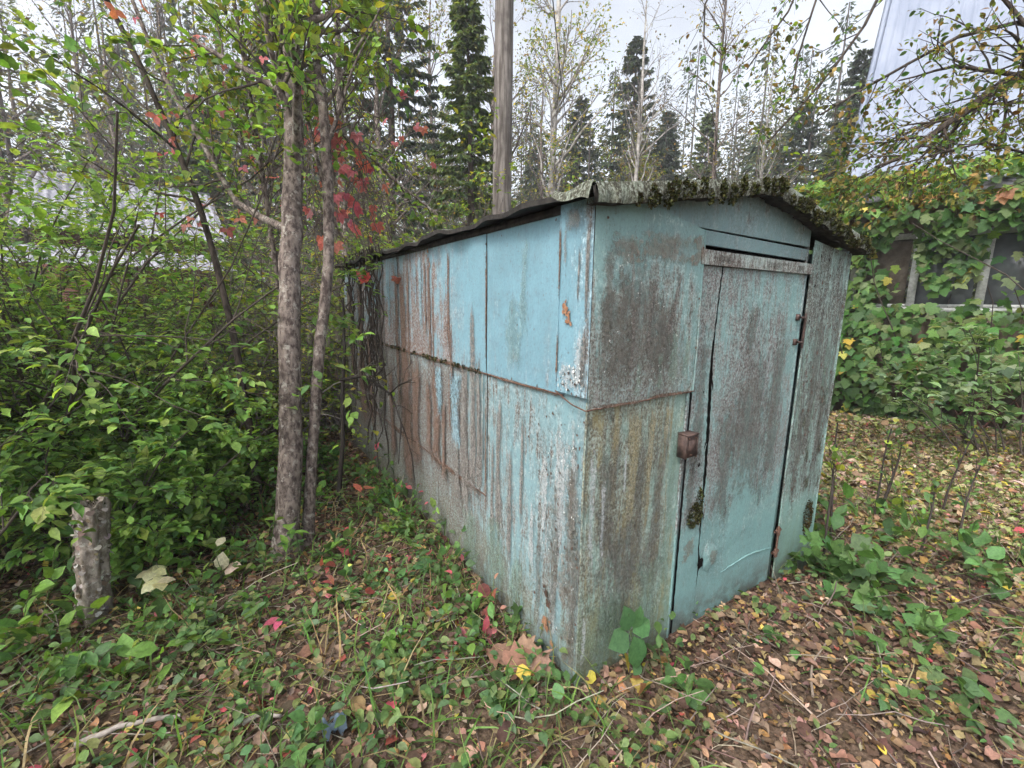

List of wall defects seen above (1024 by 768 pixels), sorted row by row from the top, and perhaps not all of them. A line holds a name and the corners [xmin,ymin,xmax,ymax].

corrosion [558,224,572,326]
corrosion [370,249,486,507]
corrosion [491,341,583,398]